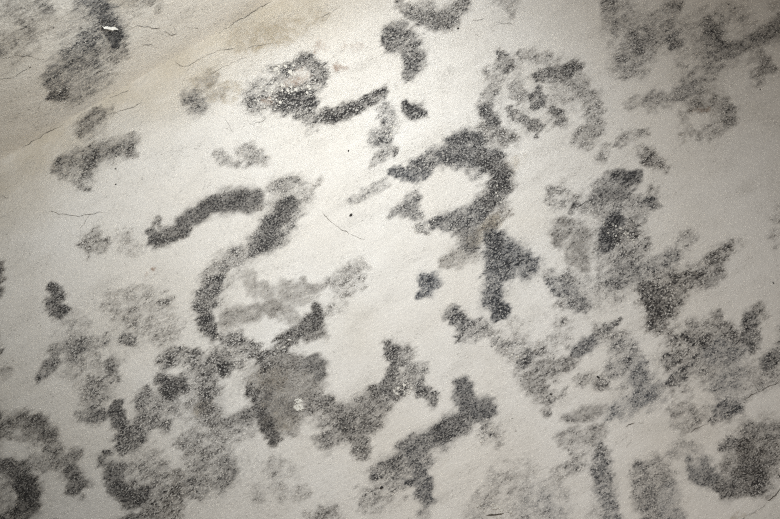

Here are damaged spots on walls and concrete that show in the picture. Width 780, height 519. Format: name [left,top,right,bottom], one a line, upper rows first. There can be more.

water stain [43,0,129,106]
water stain [51,105,139,191]
water stain [180,89,207,113]
water stain [381,0,470,83]
water stain [601,0,780,140]
water stain [240,50,780,519]
water stain [35,175,501,519]
water stain [0,410,93,519]